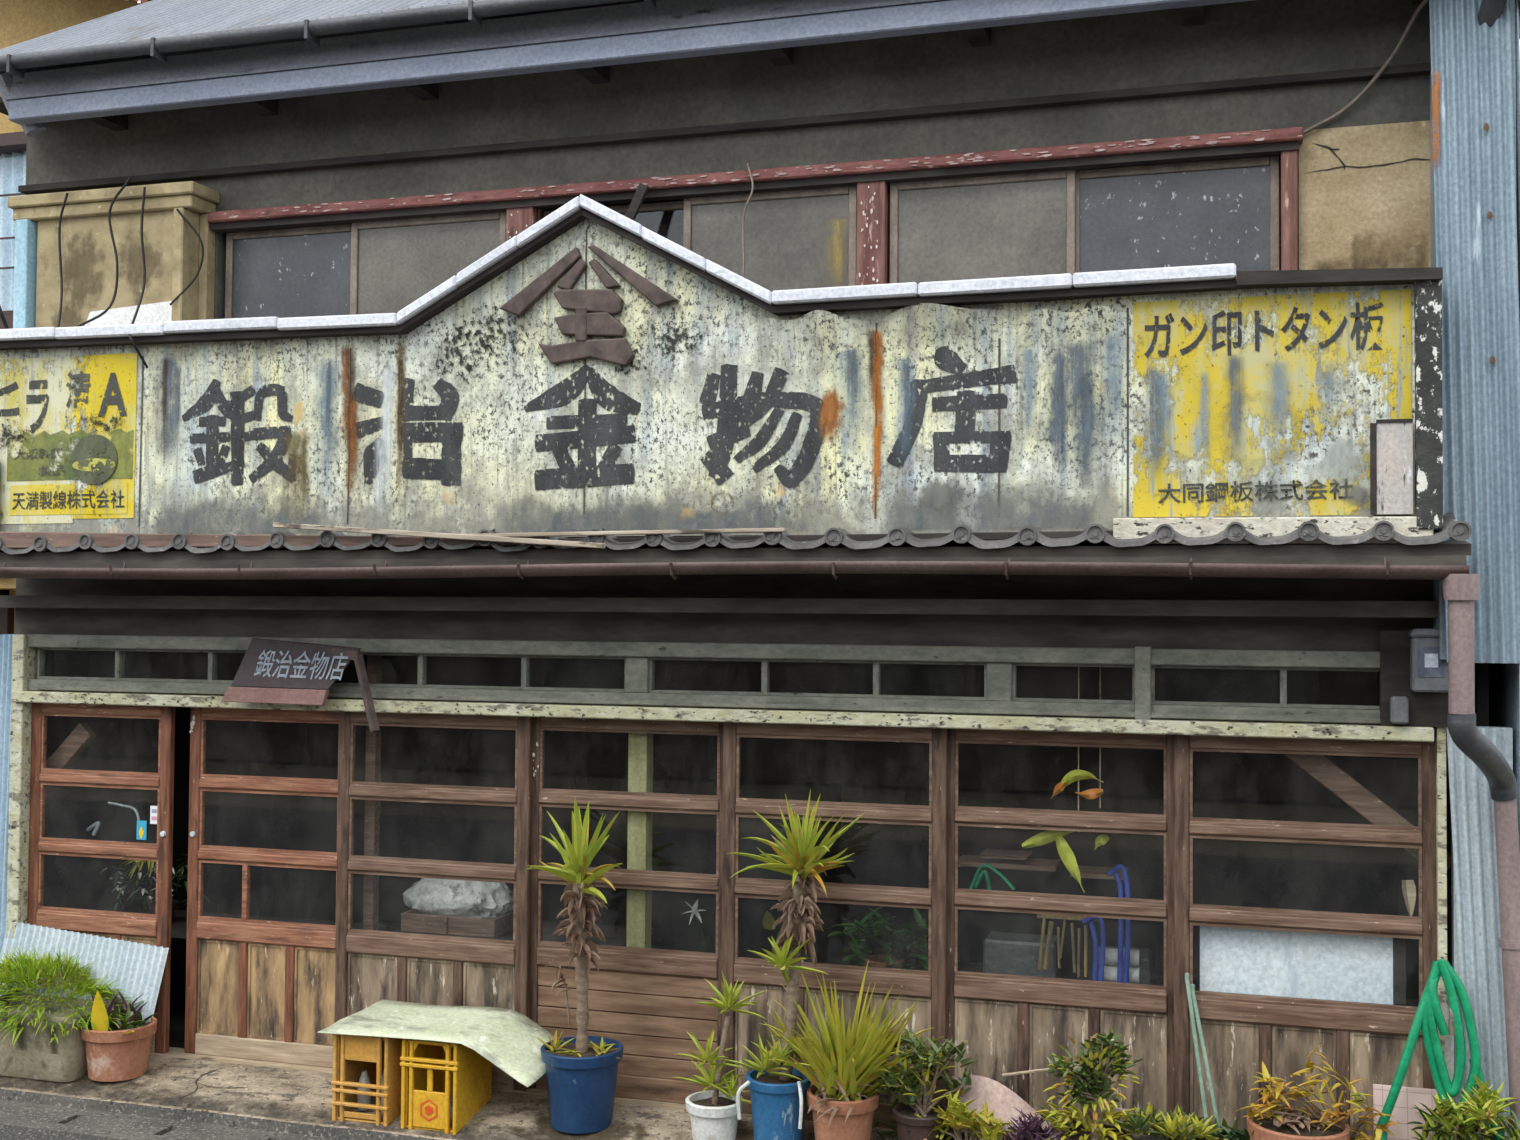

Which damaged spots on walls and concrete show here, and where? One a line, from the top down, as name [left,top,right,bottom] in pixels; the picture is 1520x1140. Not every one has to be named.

crack [1304,142,1430,174]
corrosion [341,348,357,473]
corrosion [819,389,843,438]
corrosion [868,331,882,502]
peeling [1149,372,1168,459]
peeling [1229,357,1241,437]
peeling [1273,363,1287,414]